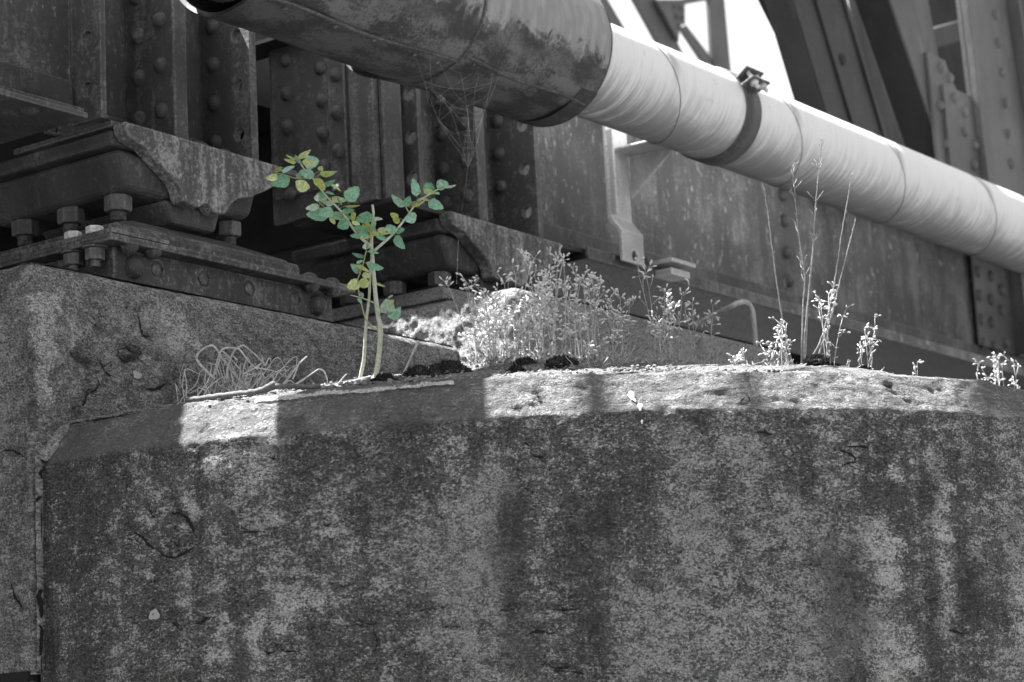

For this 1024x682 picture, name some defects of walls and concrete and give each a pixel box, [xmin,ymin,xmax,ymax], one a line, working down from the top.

damp [869,449,958,640]
damp [997,515,1024,667]